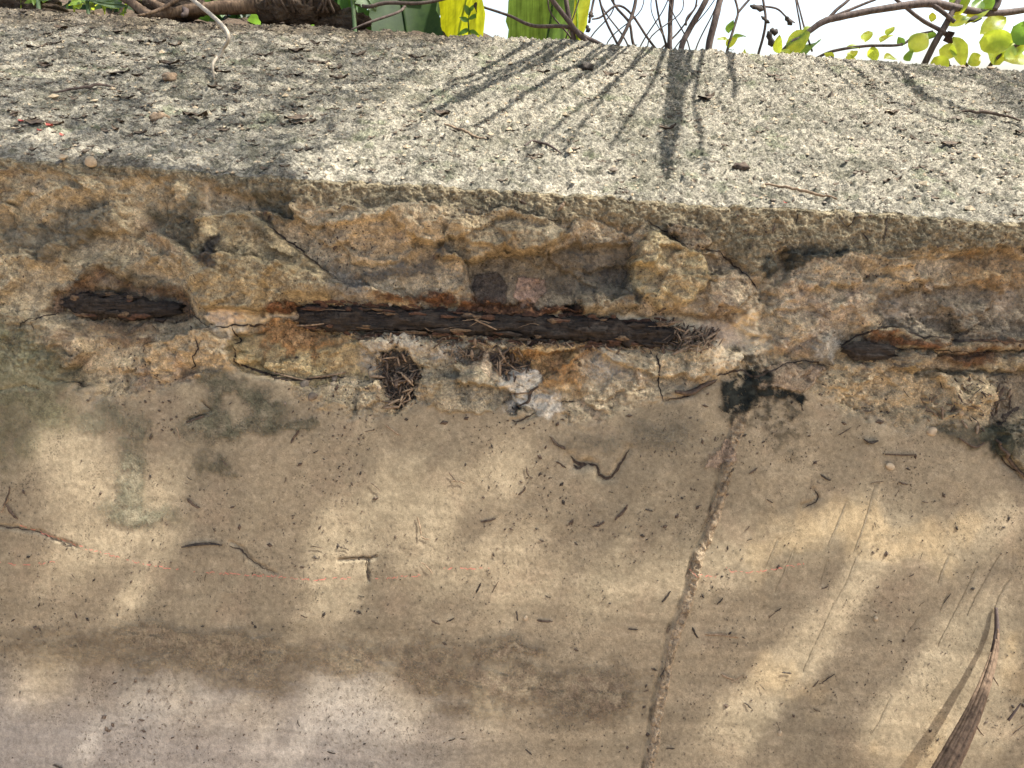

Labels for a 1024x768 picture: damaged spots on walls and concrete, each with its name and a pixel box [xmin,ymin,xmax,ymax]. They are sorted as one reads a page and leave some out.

corrosion [48,269,195,349]
spalling [0,169,795,422]
corrosion [259,290,667,391]
mould [721,347,807,421]
spalling [753,247,1024,472]
corrosion [863,329,1024,366]